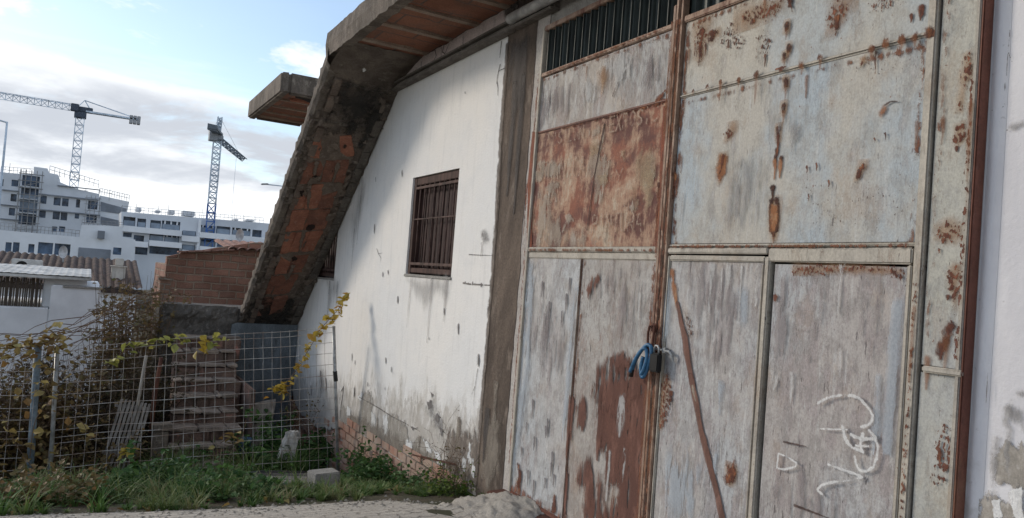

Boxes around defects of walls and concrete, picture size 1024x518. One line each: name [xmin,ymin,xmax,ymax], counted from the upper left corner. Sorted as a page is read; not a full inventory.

spalling [257,128,357,317]
rust [508,0,947,518]
rust [933,52,974,306]
flaking render [340,382,478,485]
flaking render [978,406,1024,518]